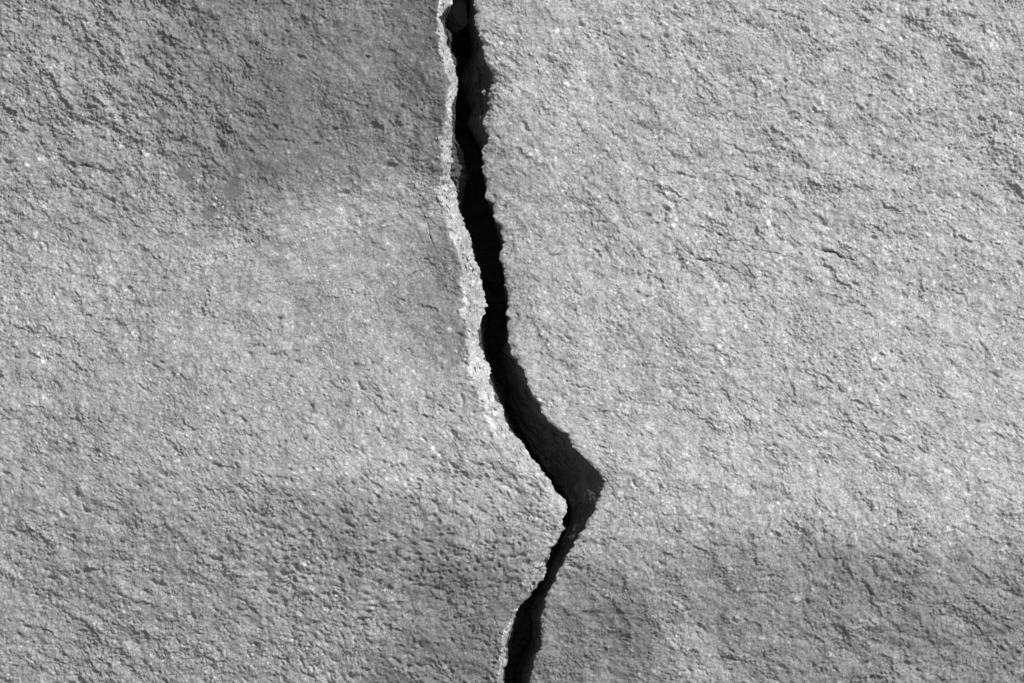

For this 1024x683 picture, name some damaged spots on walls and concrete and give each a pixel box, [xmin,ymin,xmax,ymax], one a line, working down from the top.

crack [390,0,622,683]